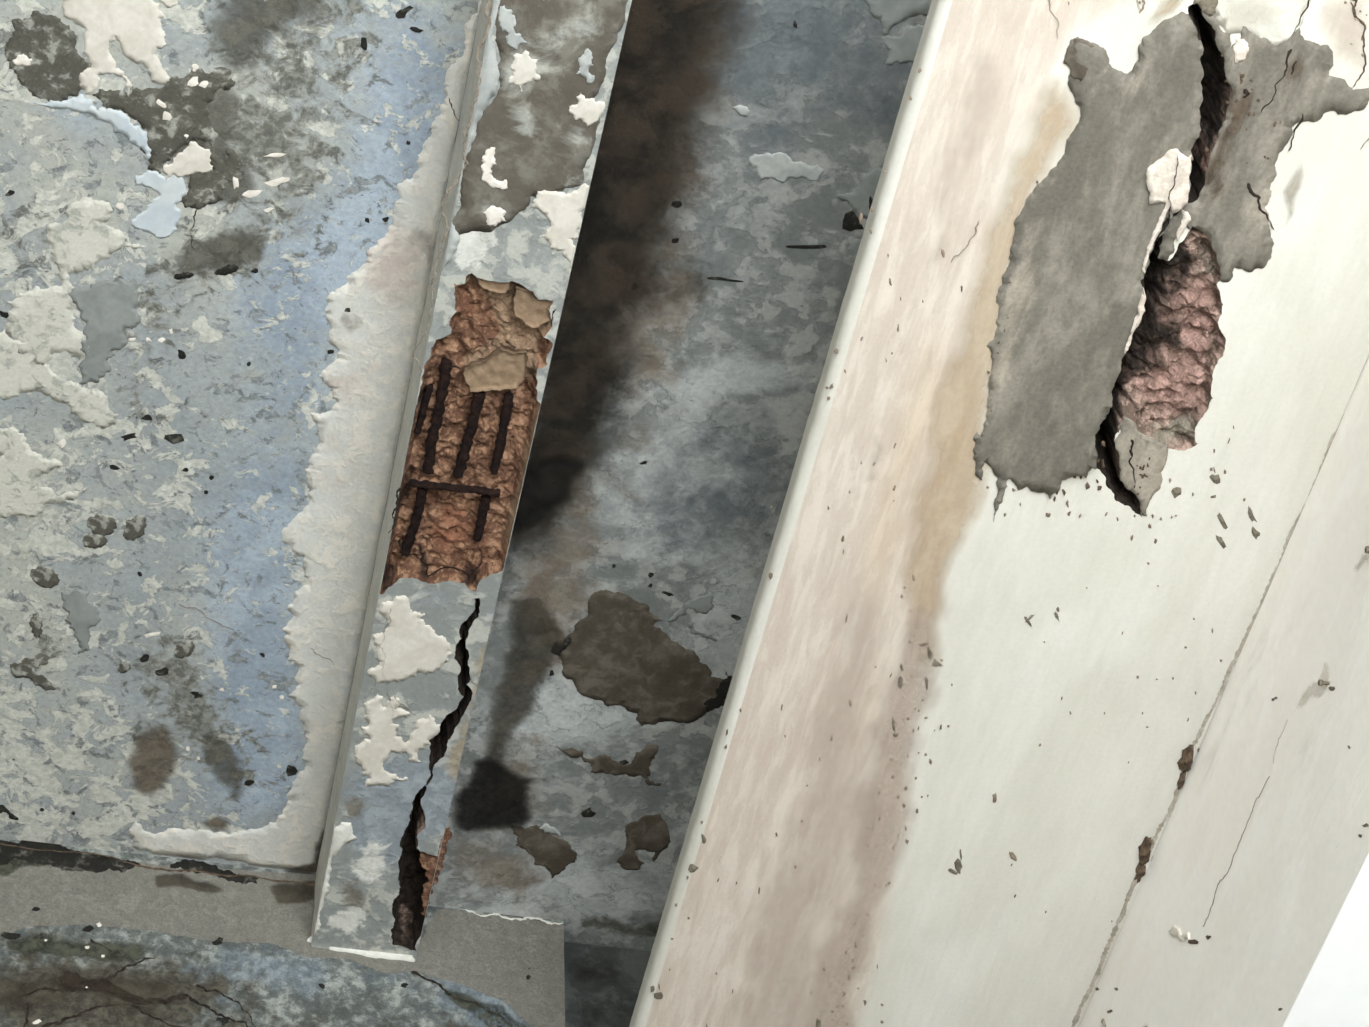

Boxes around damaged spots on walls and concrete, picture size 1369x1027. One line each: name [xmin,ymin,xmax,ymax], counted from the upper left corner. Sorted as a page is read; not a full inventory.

damp [215,0,314,67]
crack [1293,0,1310,33]
crack [1350,0,1367,87]
peeling [0,0,290,429]
flaking render [973,0,1369,518]
peeling [128,0,628,936]
damp [487,601,561,765]
peeling [551,590,732,727]
crack [391,598,512,1027]
damp [9,935,147,961]
crack [19,939,256,1027]
damp [445,991,525,1027]